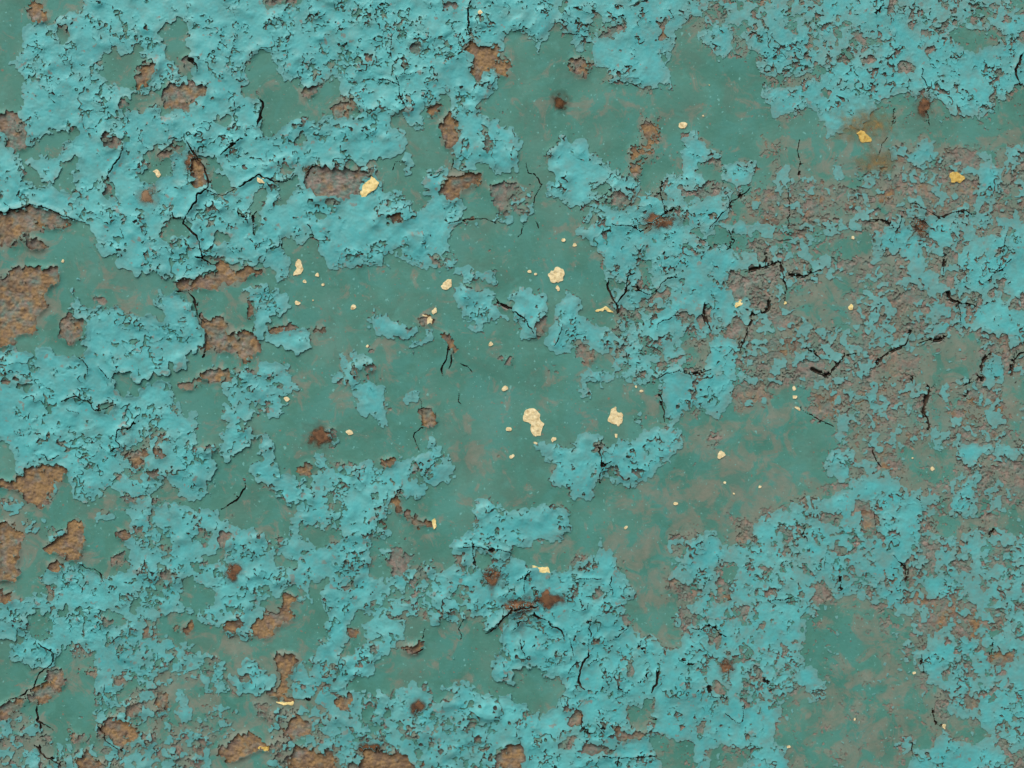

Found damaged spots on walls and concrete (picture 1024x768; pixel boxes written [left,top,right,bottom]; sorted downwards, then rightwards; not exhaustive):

crack [172,99,294,265]
peeling [0,0,1024,340]
peeling [331,349,388,428]
crack [440,347,472,374]
peeling [523,408,544,436]
peeling [608,407,623,426]
crack [606,275,677,313]
crack [739,254,820,353]
peeling [768,317,878,385]
crack [806,256,974,377]
crack [6,647,61,765]
peeling [164,704,282,768]